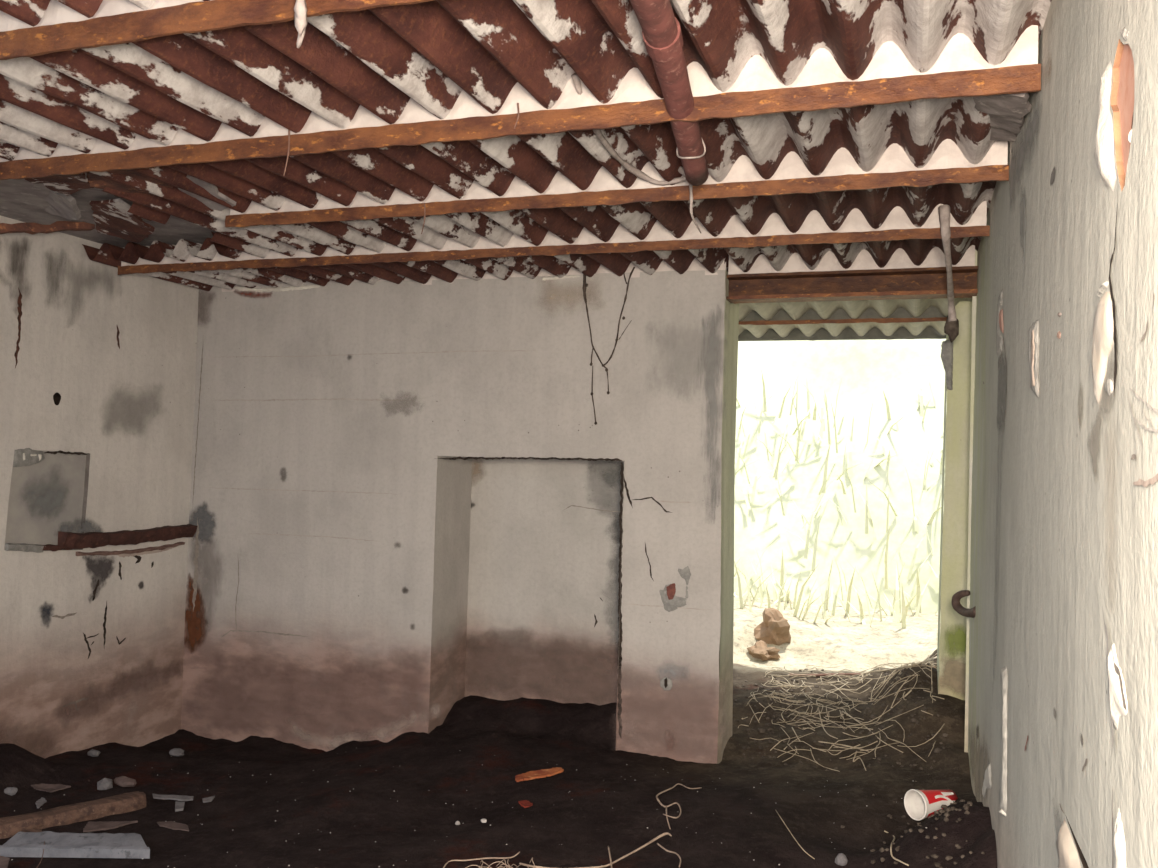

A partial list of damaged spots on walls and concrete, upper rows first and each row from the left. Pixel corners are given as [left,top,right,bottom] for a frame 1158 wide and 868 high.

spalling [1094,27,1135,192]
corrosion [0,170,237,243]
damp [11,241,27,294]
crack [14,287,22,368]
peeling [1092,281,1115,406]
damp [41,605,76,625]
crack [83,602,126,658]
corrosion [185,577,206,652]
damp [466,461,638,704]
crack [438,456,672,739]
spalling [1056,818,1081,868]
peeling [1112,786,1126,868]